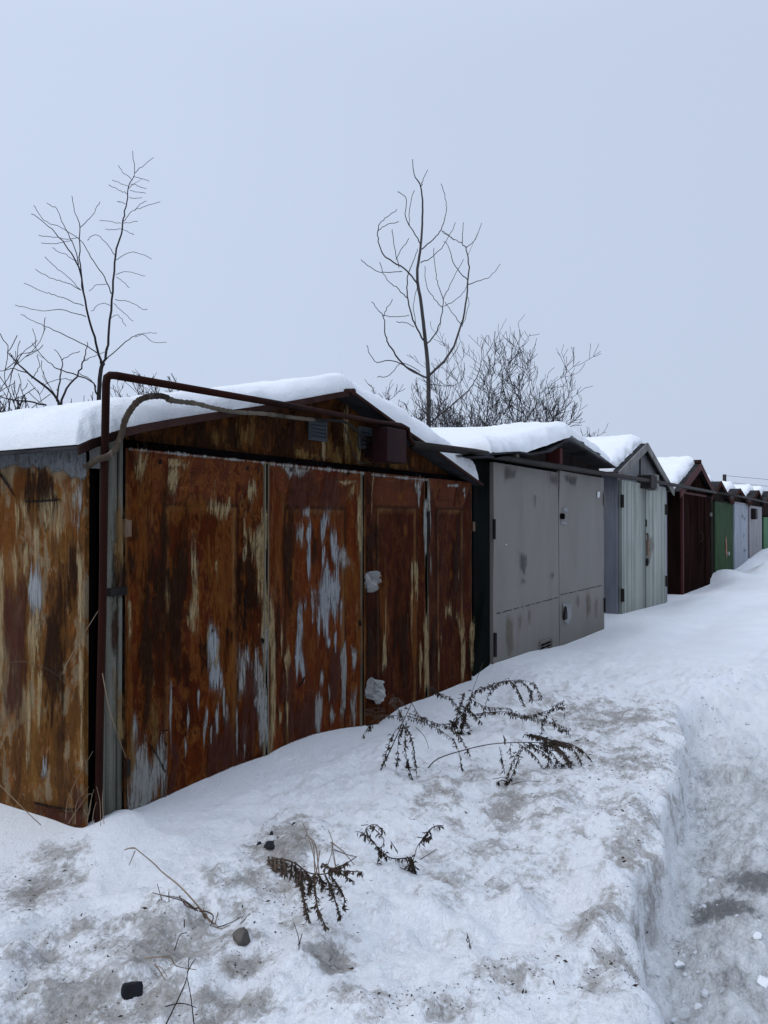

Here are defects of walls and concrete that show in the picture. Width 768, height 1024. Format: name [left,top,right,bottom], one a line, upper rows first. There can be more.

corrosion [0,455,79,751]
corrosion [35,776,84,828]
corrosion [111,456,259,807]
peeling [129,449,442,755]
corrosion [277,666,315,743]
corrosion [276,410,371,652]
corrosion [328,648,340,705]
peeling [445,606,475,680]